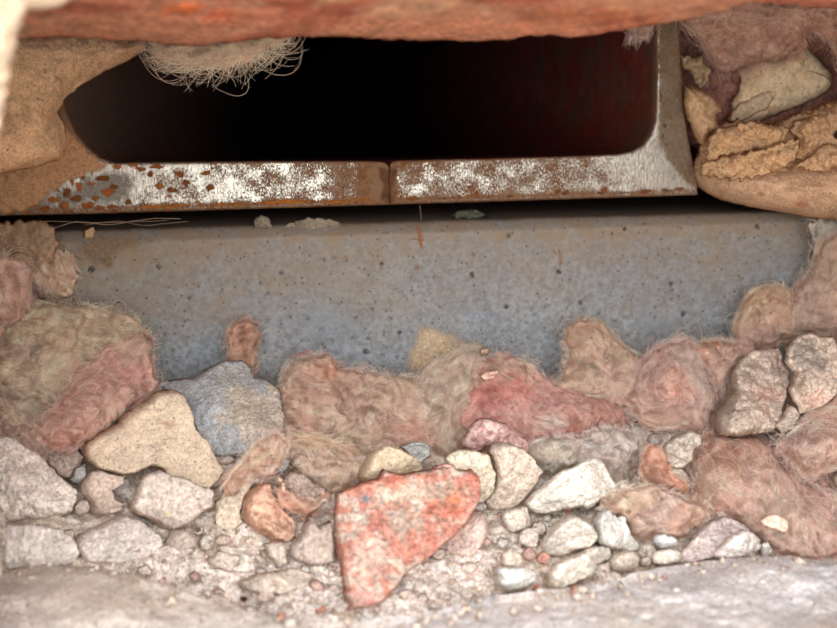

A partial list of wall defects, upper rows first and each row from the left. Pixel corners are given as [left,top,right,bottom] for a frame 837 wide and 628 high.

rust [11,175,132,213]
rust [112,163,397,210]